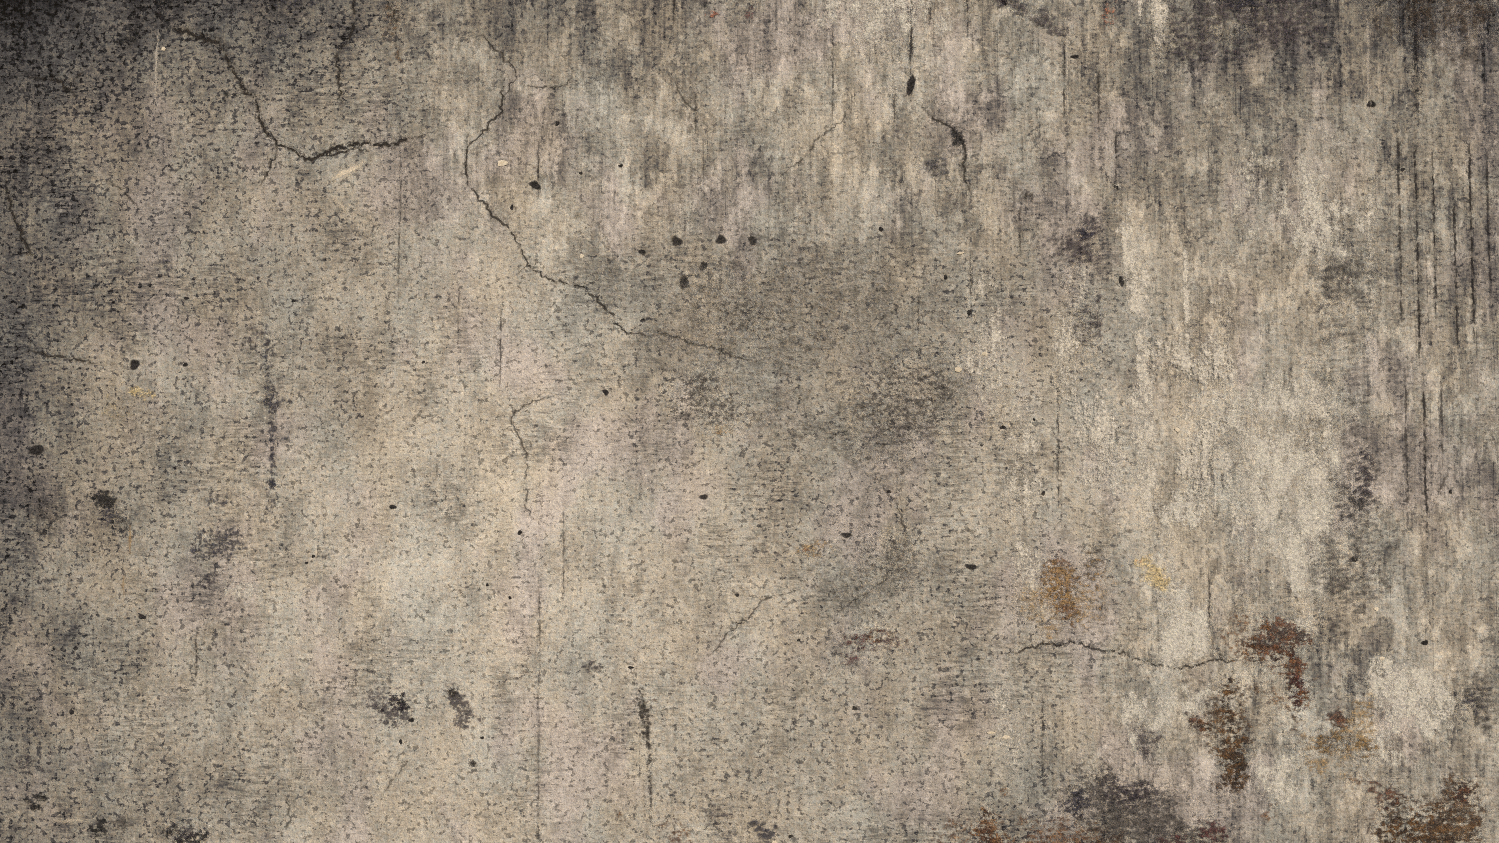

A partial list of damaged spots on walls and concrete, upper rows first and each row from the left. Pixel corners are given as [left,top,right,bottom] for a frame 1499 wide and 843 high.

damp [1148,0,1329,70]
crack [174,28,407,178]
crack [465,38,741,358]
damp [1318,175,1375,341]
damp [1181,249,1230,381]
rust [1041,552,1104,626]
crack [1019,640,1234,670]
rust [1185,615,1312,791]
rust [1316,710,1387,757]
rust [938,807,1122,843]
rust [1350,772,1486,843]